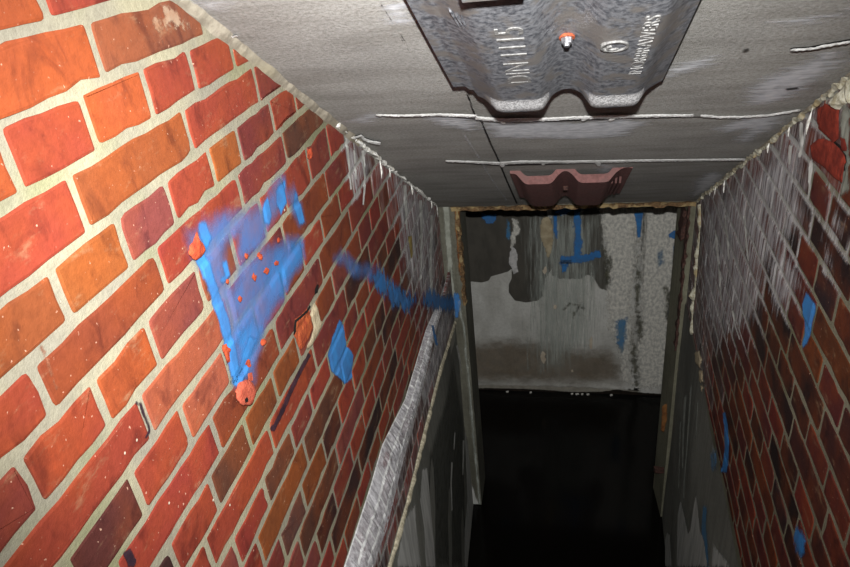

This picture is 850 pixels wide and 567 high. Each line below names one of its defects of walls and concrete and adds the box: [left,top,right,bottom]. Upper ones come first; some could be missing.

damp [336,123,465,472]
peeling [510,219,520,247]
damp [397,206,677,567]
damp [688,77,850,352]
spalling [810,103,847,183]